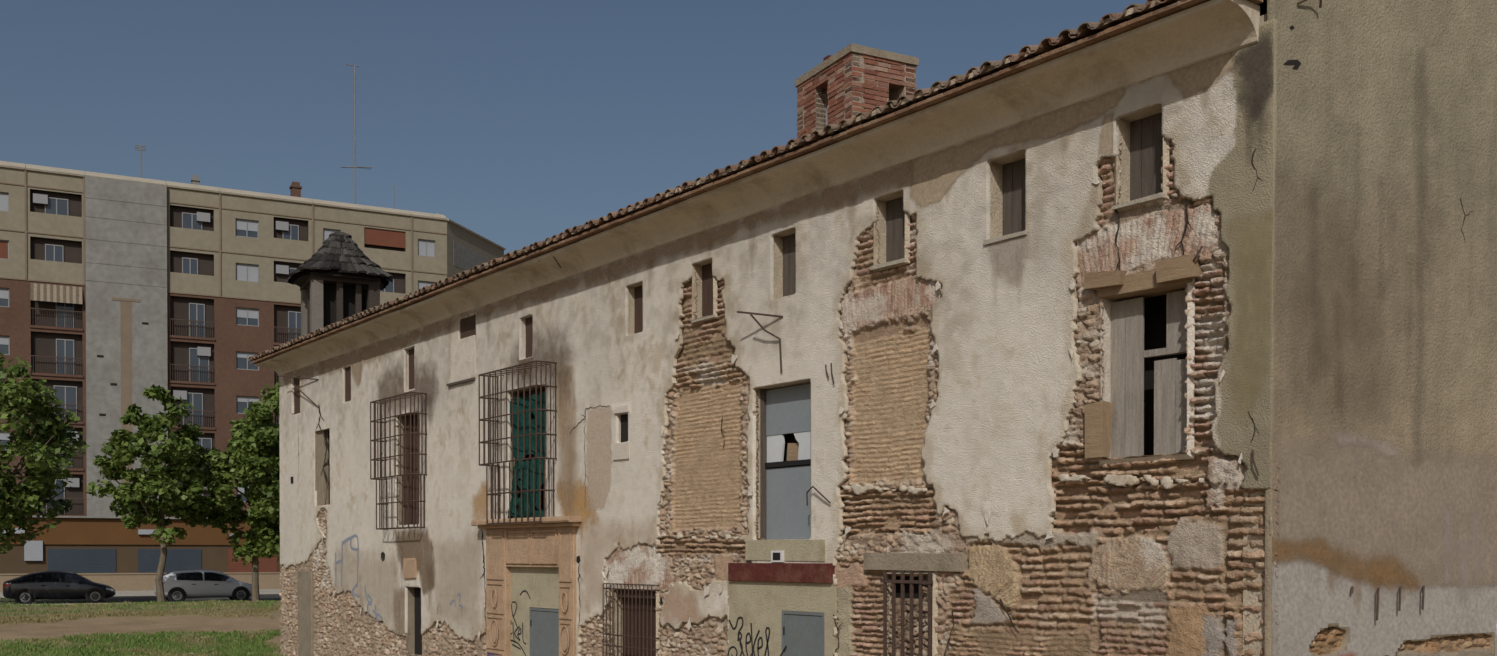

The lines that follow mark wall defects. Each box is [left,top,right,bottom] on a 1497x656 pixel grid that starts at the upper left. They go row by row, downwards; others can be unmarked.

crack [1251,148,1263,191]
flaking render [834,51,1280,656]
flaking render [580,267,766,656]
flaking render [279,504,487,656]
flaking render [1310,627,1344,655]
flaking render [1397,634,1491,656]